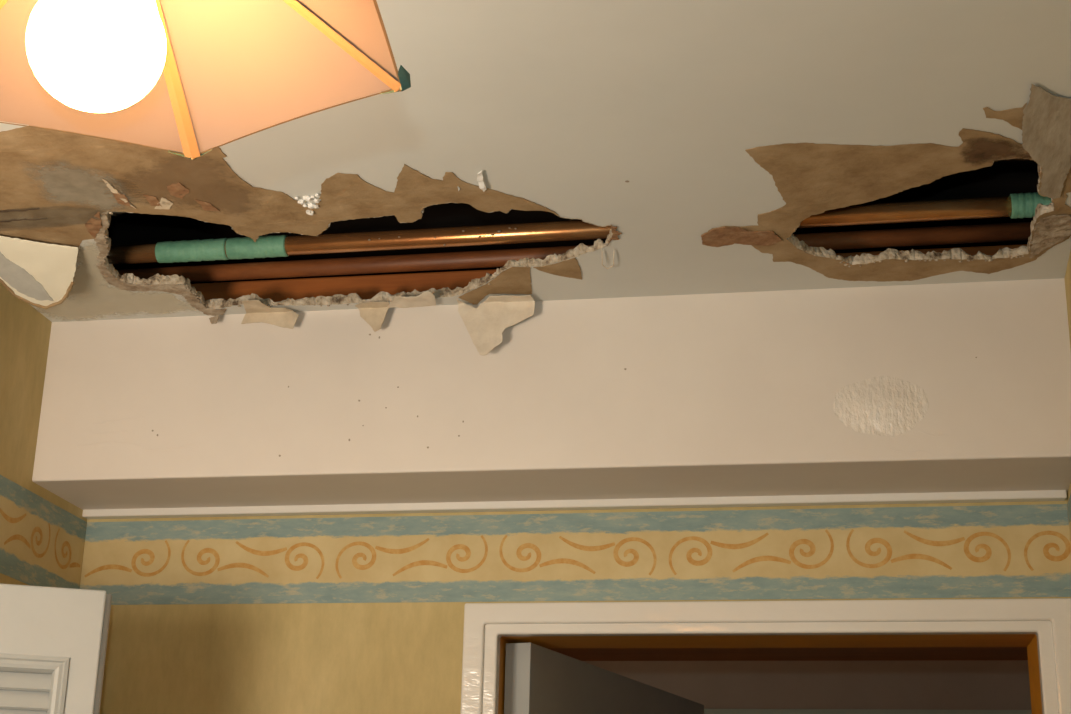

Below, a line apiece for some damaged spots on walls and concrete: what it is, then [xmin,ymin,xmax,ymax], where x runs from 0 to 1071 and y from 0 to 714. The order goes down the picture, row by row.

peeling [294,194,320,215]
peeling [477,171,487,192]
spalling [787,164,1071,265]
peeling [0,236,78,309]
spalling [94,211,613,355]